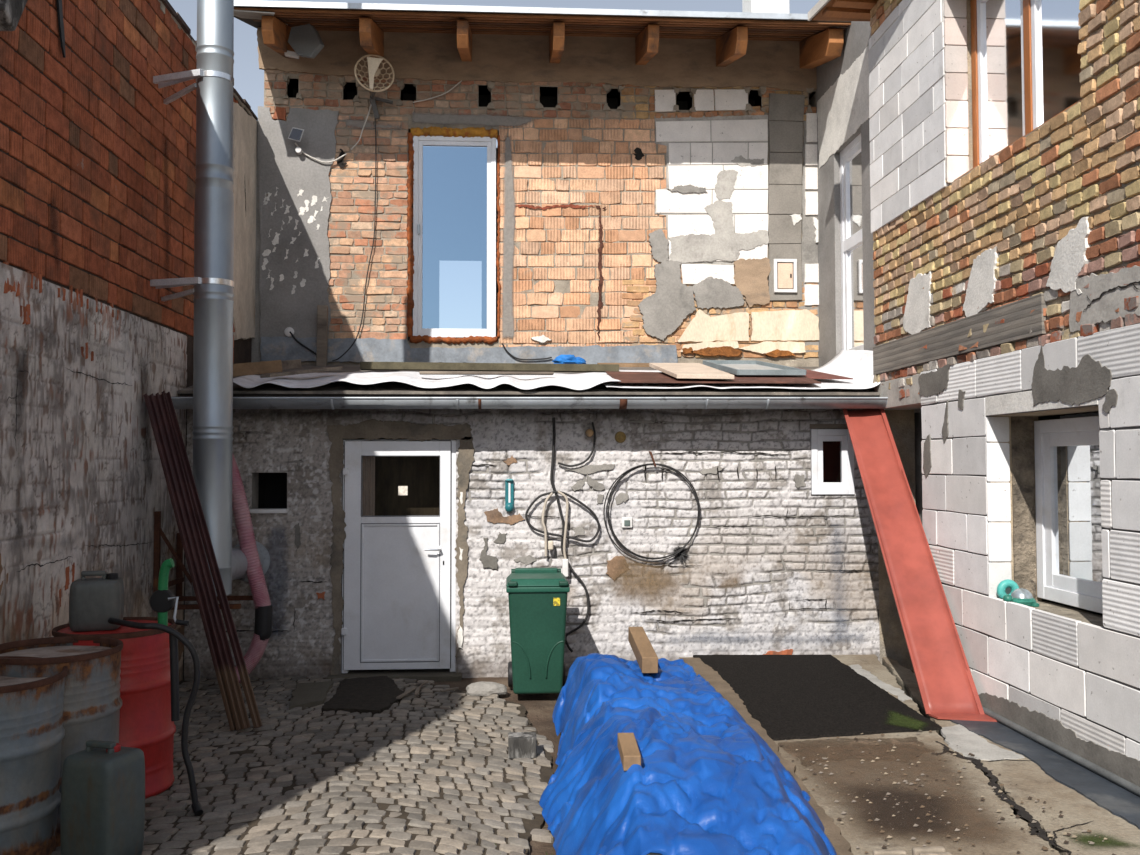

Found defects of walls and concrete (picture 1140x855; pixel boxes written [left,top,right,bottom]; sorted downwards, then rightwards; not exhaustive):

peeling [3,261,42,325]
crack [515,204,606,340]
crack [935,741,1091,854]